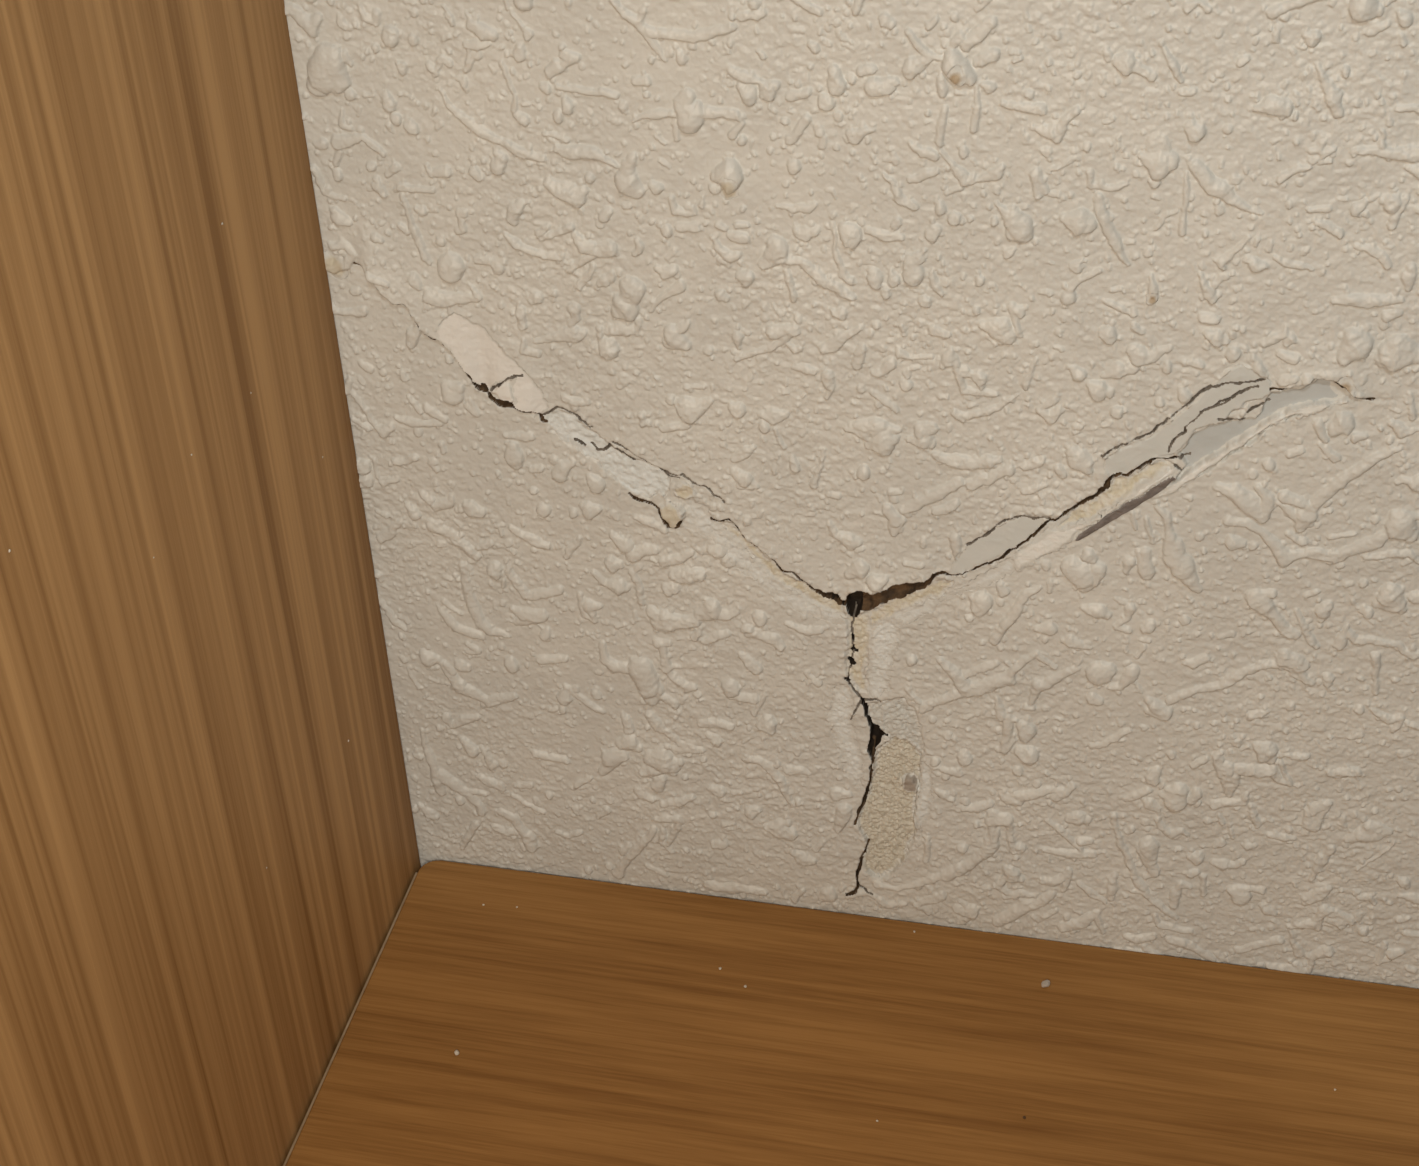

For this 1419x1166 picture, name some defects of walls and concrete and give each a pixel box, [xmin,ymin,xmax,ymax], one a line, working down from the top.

crack [398,304,1375,896]
spalling [436,313,1349,878]